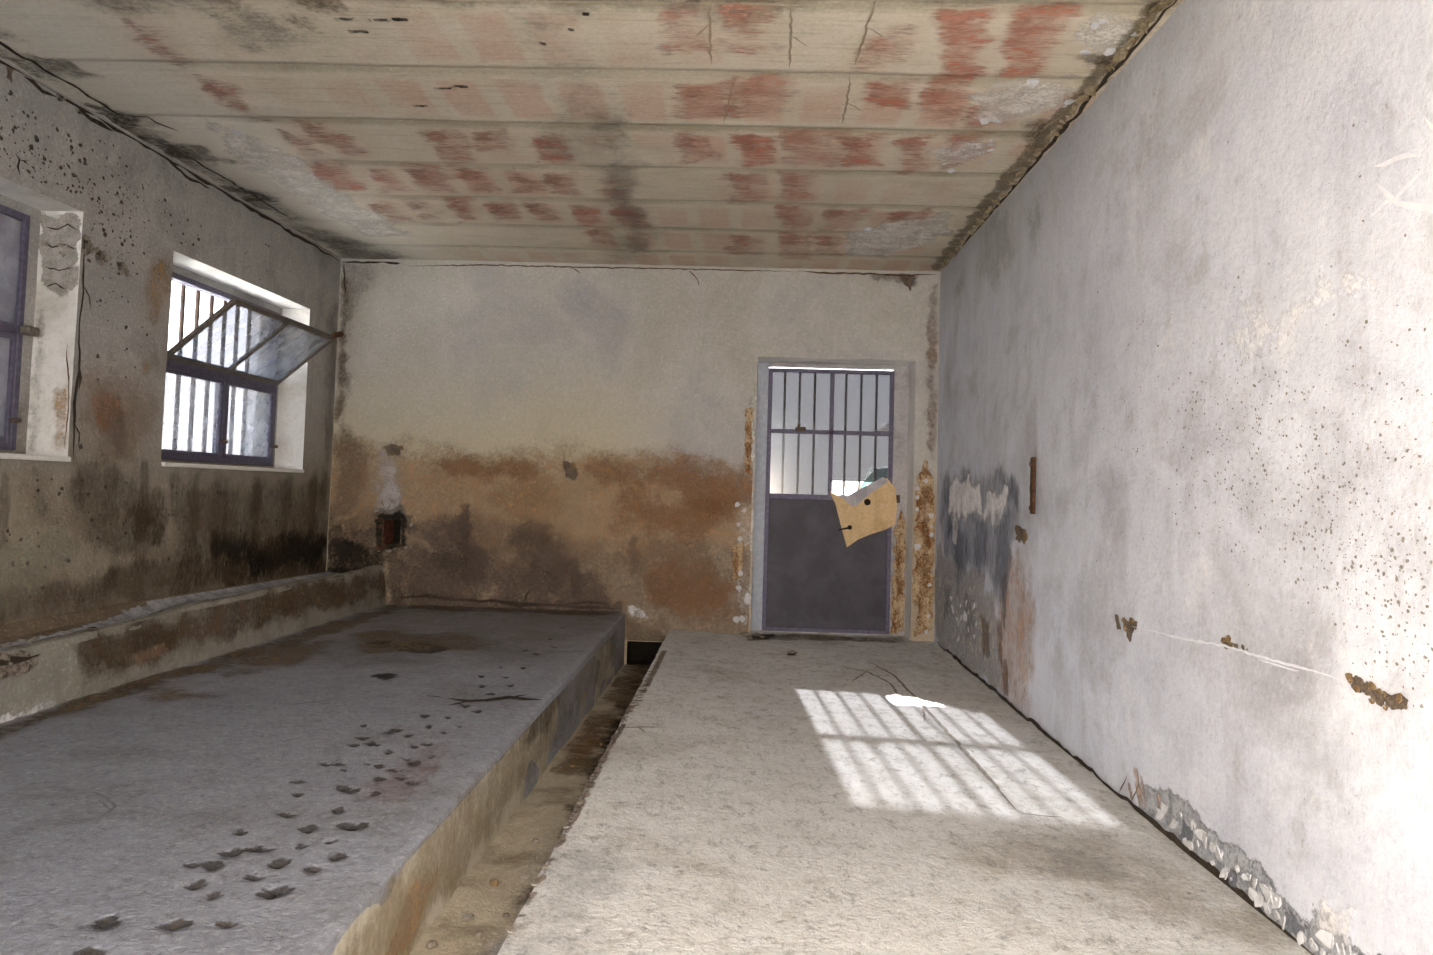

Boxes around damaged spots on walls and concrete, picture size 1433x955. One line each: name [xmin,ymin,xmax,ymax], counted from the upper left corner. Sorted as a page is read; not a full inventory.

water stain [0,41,398,259]
spalling [842,0,1178,270]
peeling [39,212,130,296]
peeling [0,572,333,679]
spalling [372,444,413,554]
water stain [79,400,753,677]
water stain [948,474,1017,628]
peeling [1136,781,1381,955]